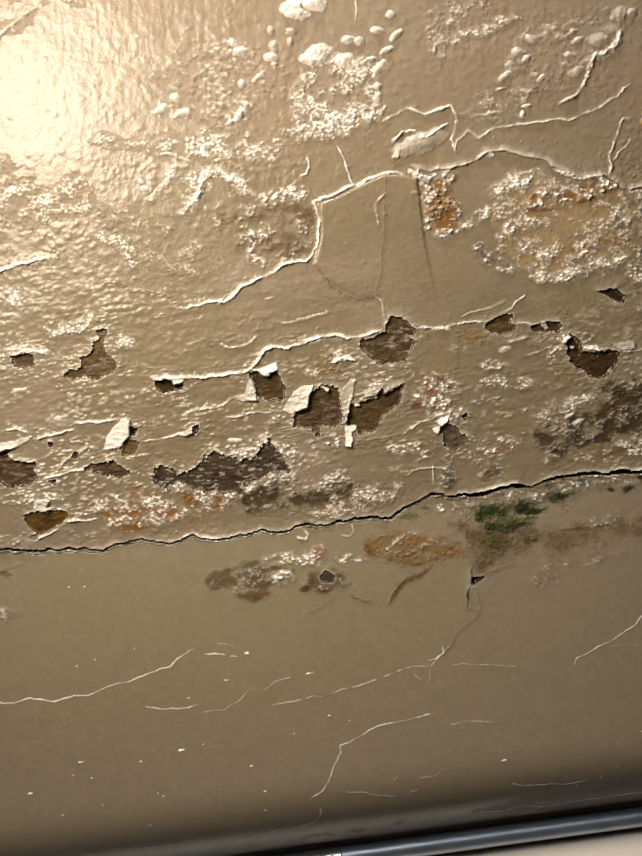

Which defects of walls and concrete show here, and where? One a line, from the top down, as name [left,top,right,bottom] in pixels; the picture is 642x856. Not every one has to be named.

spalling [583,273,642,322]
spalling [461,298,642,393]
spalling [0,300,502,535]
flaking render [202,555,359,601]
crack [0,455,642,580]
rust [355,522,466,606]
peeling [420,475,642,519]
crack [0,599,527,714]
crack [573,615,642,666]
crack [230,713,642,856]